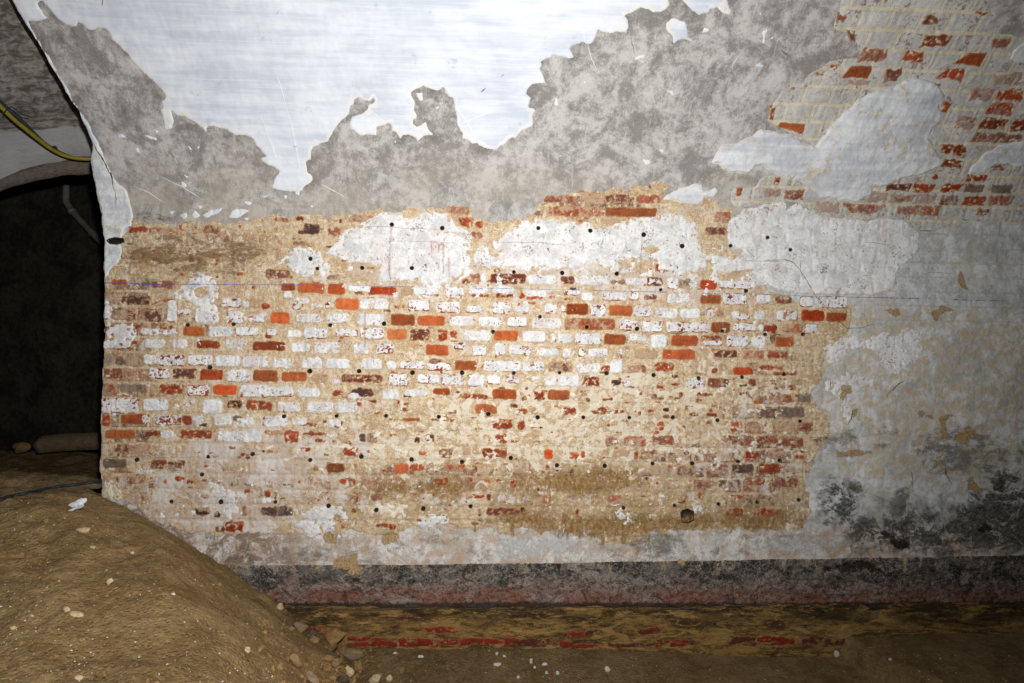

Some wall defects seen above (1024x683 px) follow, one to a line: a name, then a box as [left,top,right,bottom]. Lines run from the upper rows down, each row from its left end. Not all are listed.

flaking render [29,0,1024,545]
damp [474,431,1024,558]